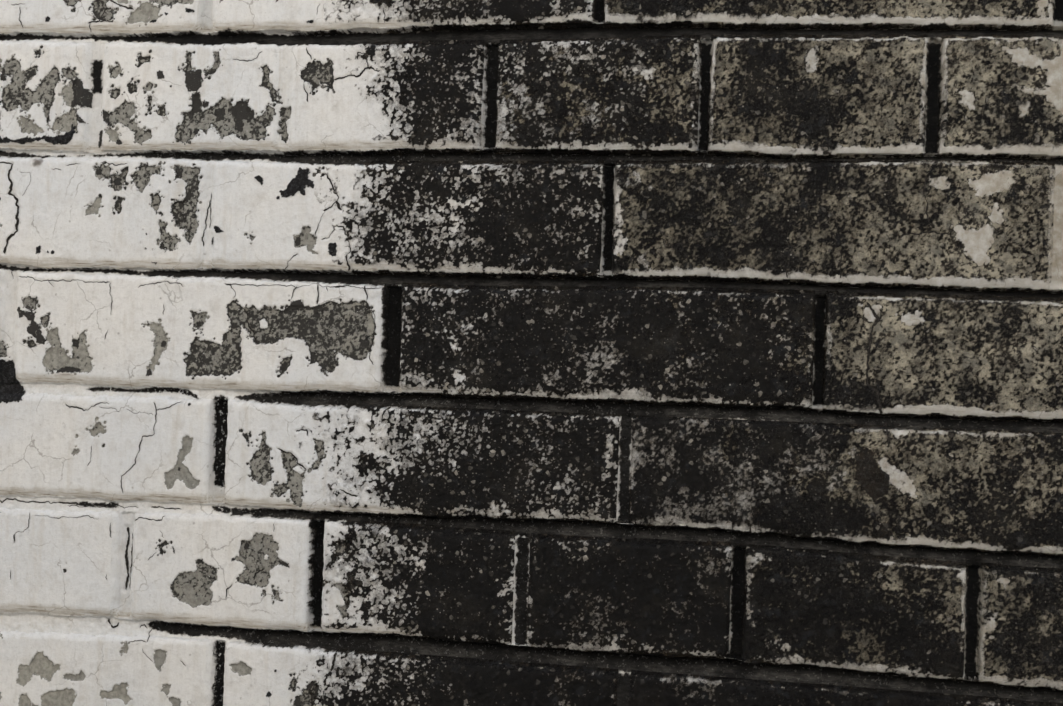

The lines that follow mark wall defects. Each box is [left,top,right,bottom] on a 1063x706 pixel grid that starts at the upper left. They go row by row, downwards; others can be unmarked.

peeling [63,0,194,27]
peeling [0,49,283,148]
crack [0,156,127,338]
peeling [84,161,203,252]
peeling [17,294,93,375]
peeling [183,298,377,380]
crack [0,402,180,588]
peeling [239,429,327,507]
peeling [170,558,219,608]
peeling [231,532,289,604]
peeling [16,652,86,706]
crack [108,619,154,662]